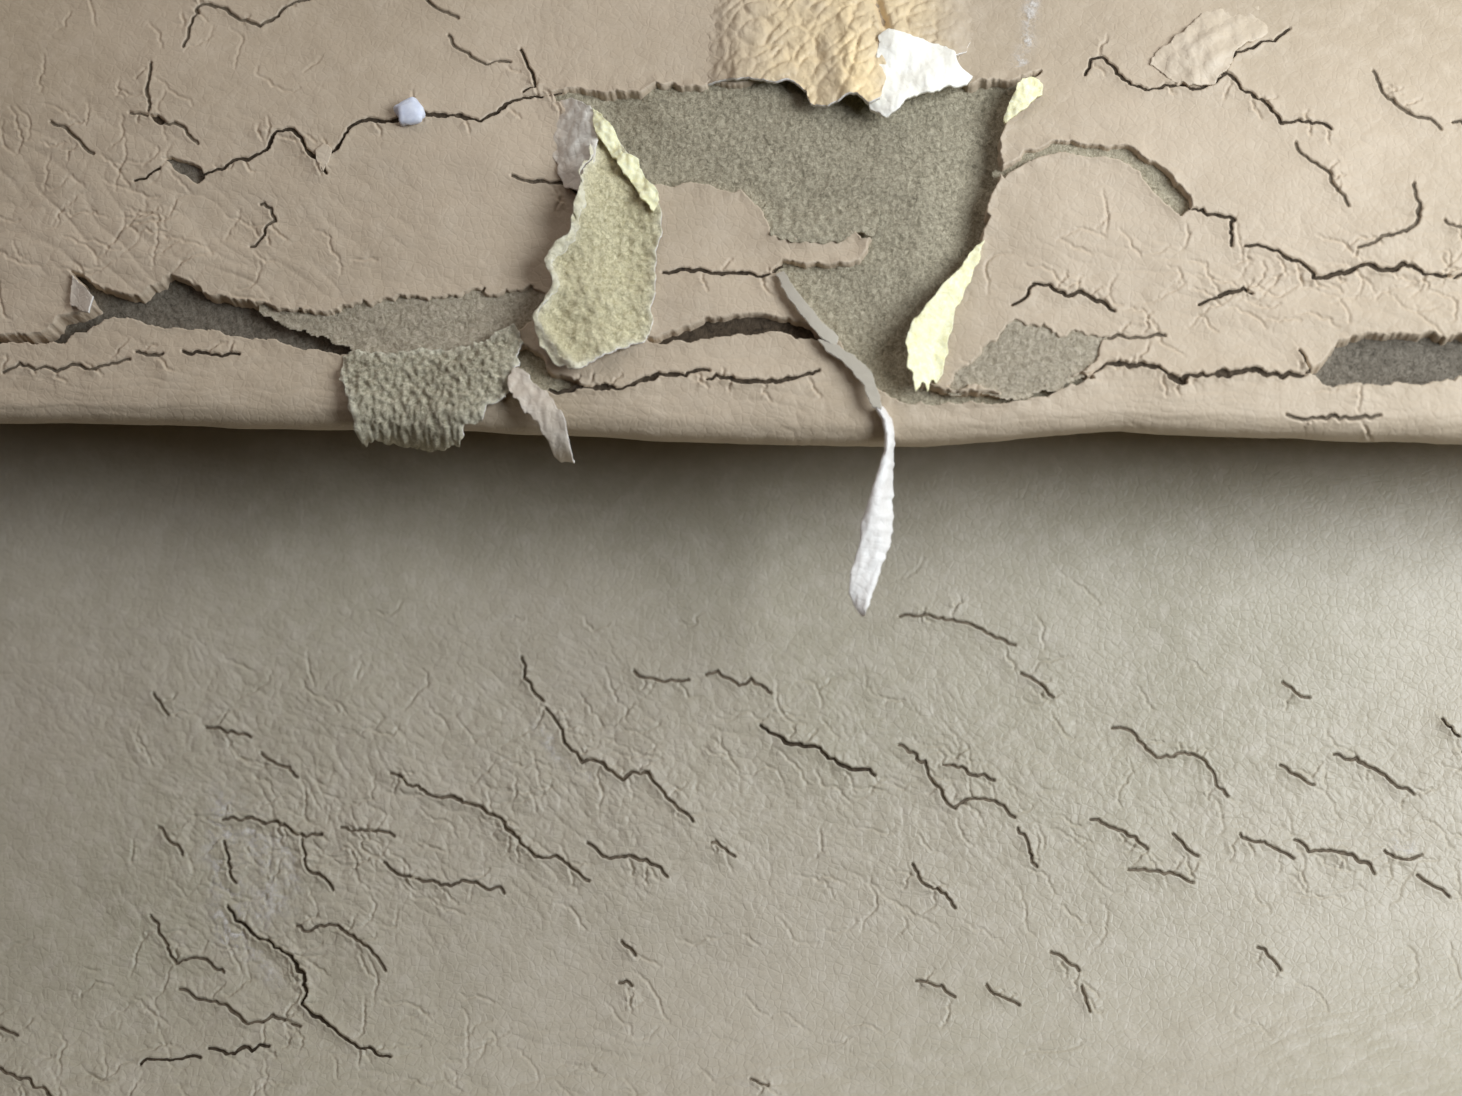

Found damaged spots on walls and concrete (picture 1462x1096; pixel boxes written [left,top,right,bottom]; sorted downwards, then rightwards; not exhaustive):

crack [129,0,562,178]
peeling [1150,6,1268,87]
crack [1084,28,1349,207]
crack [1245,183,1462,280]
peeling [44,0,1107,616]
crack [1012,282,1380,421]
peeling [1313,337,1462,387]
crack [633,670,875,776]
crack [390,772,668,882]
crack [898,744,1037,867]
crack [1239,834,1450,898]
crack [140,816,505,1065]